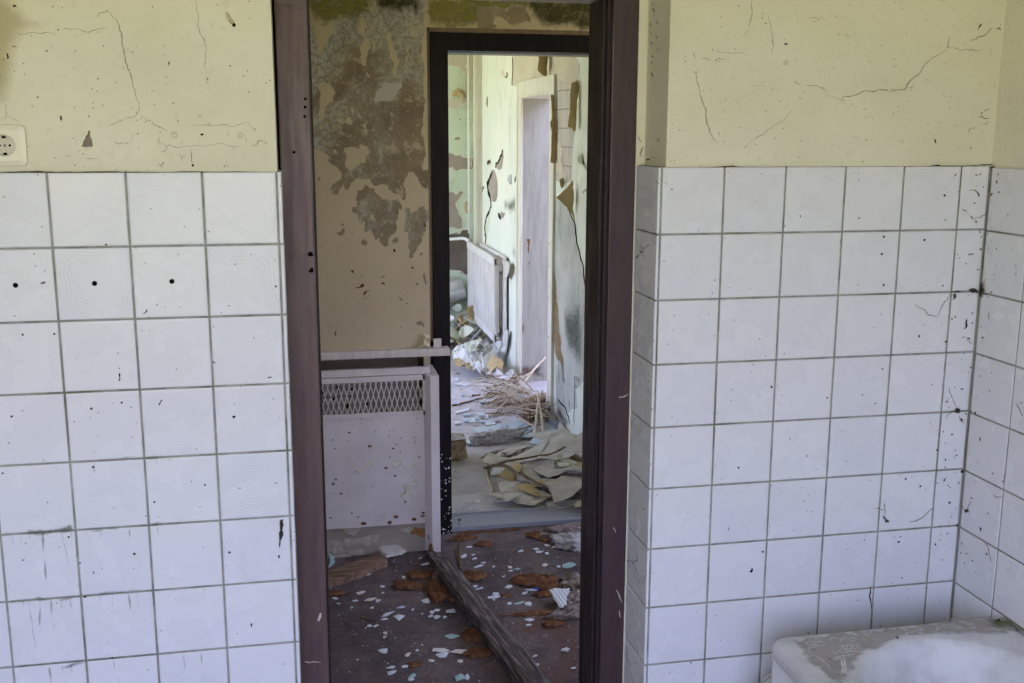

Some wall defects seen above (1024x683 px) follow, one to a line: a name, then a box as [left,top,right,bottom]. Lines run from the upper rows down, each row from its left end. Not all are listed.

crack [0,10,267,173]
peeling [309,0,429,258]
peeling [482,149,516,244]
peeling [501,56,587,183]
crack [693,3,774,140]